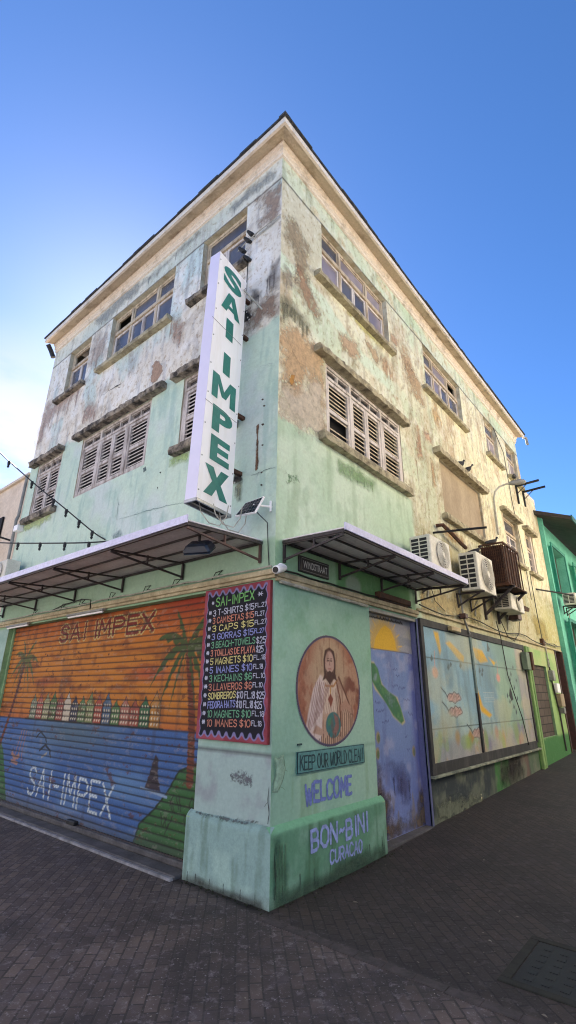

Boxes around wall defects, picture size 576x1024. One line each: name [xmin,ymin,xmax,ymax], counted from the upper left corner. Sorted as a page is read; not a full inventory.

peeling [257,182,319,318]
peeling [280,327,324,390]